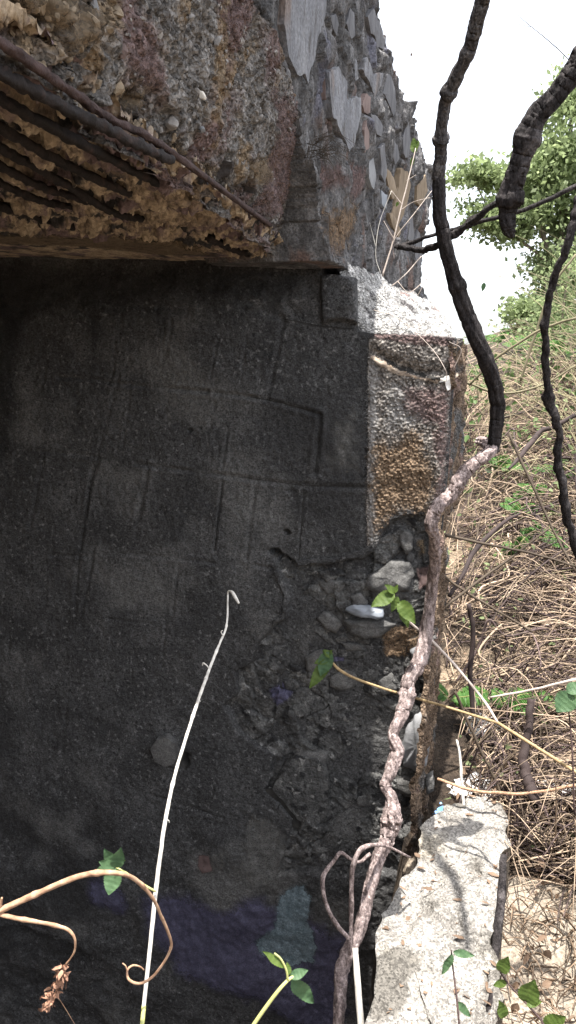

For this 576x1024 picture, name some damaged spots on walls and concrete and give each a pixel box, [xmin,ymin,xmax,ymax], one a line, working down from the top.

rust [10,0,108,48]
spalling [0,0,299,261]
rust [248,92,297,217]
spalling [226,509,435,886]